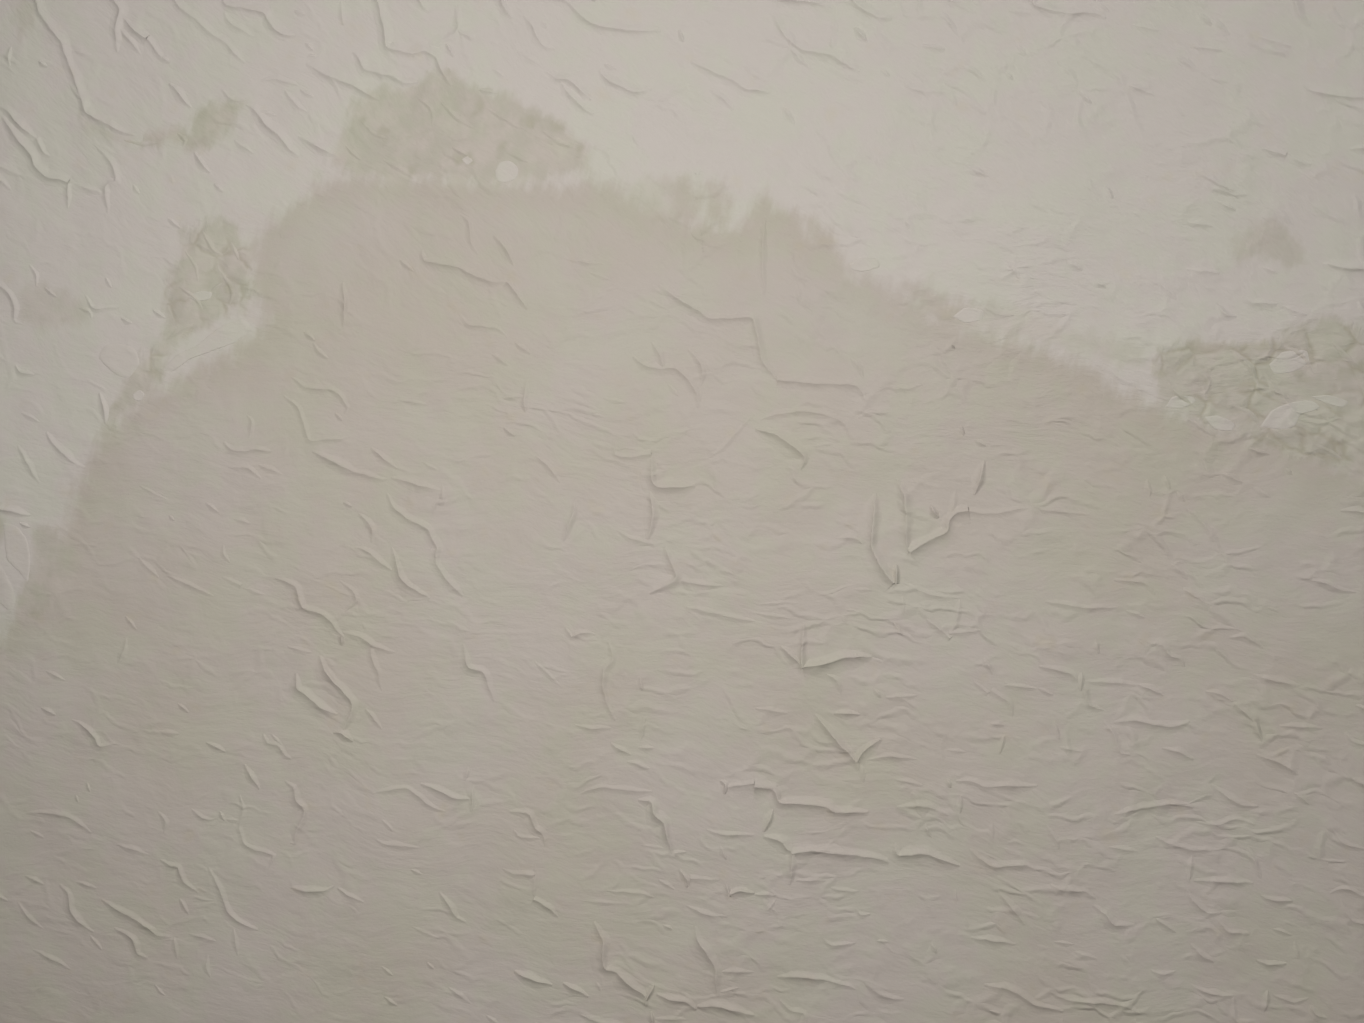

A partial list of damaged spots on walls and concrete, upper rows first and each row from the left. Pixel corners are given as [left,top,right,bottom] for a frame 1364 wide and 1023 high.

leakage [316,51,706,252]
leakage [924,283,1152,388]
peeling [1261,395,1348,429]
leakage [0,492,92,634]